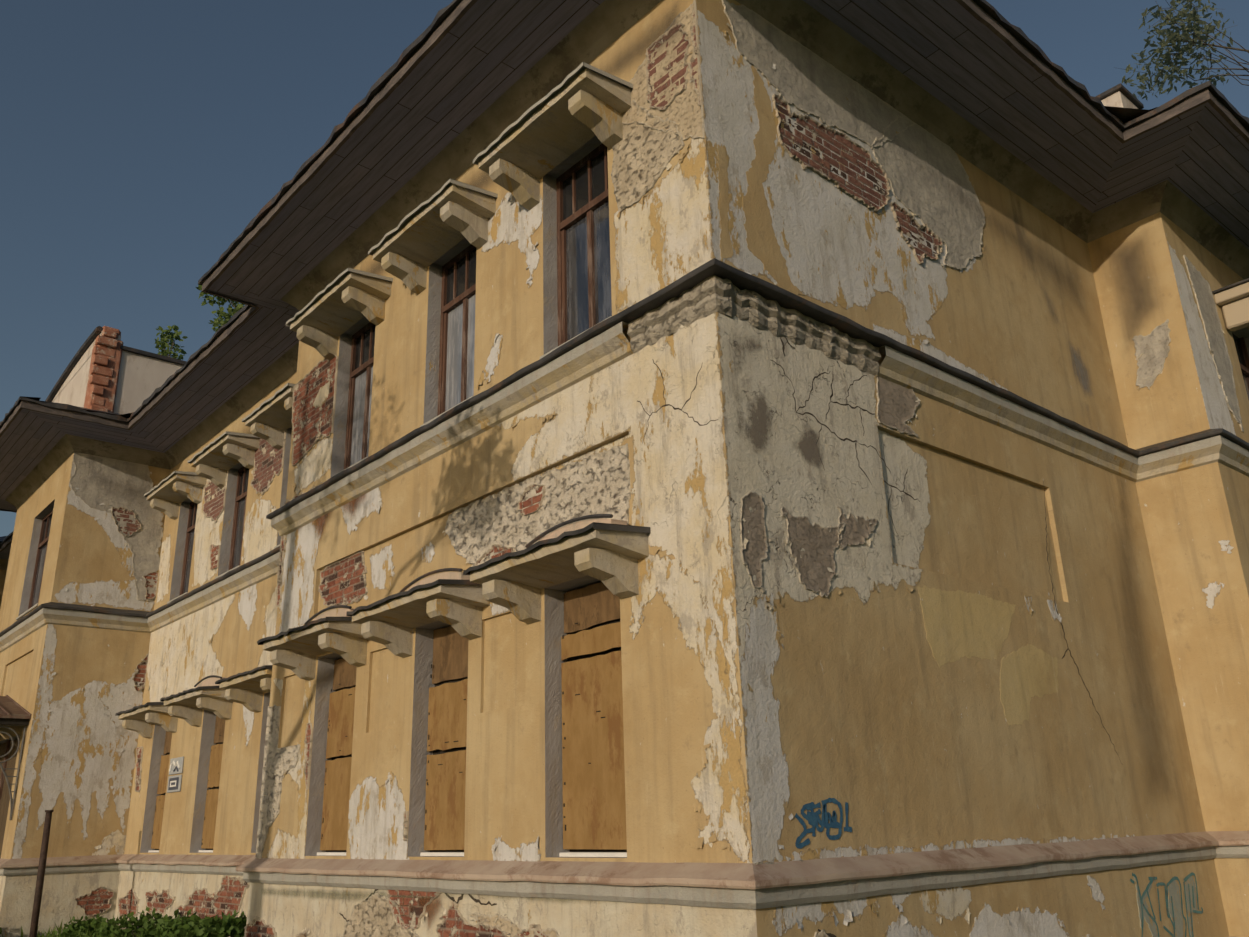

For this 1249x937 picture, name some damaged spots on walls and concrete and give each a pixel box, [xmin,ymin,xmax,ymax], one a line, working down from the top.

peeling [611,0,1015,394]
crack [771,337,920,536]
flaking render [1132,319,1171,391]
peeling [1167,241,1244,435]
peeling [12,355,395,859]
peeling [421,312,1135,863]
crack [1043,481,1123,765]
flaking render [74,875,277,937]
flaking render [343,890,560,937]
peeling [772,886,1092,937]
peeling [1087,875,1106,910]